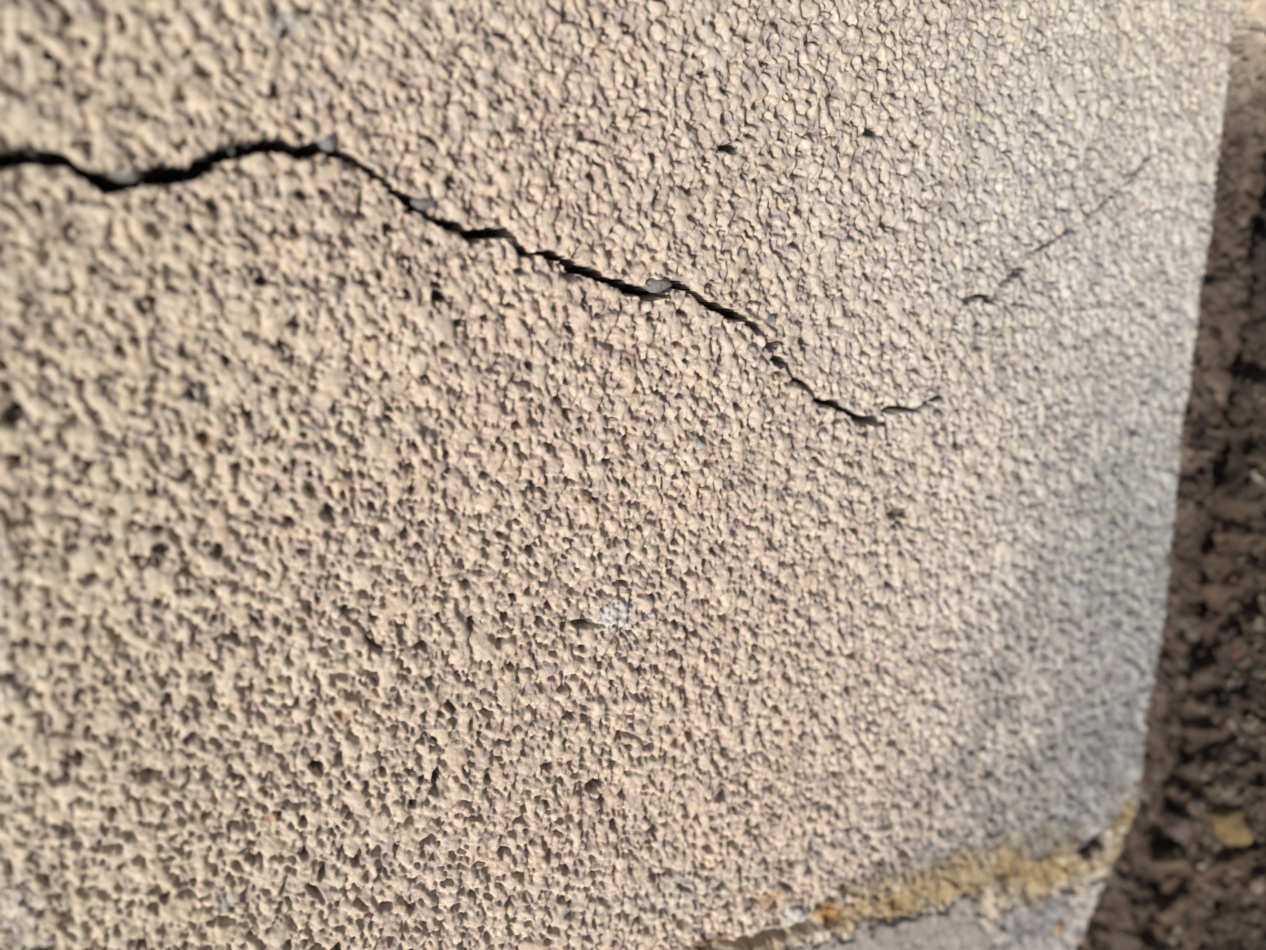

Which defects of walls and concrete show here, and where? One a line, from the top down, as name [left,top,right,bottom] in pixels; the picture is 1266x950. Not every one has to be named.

crack [0,135,945,445]
crack [954,226,1067,326]